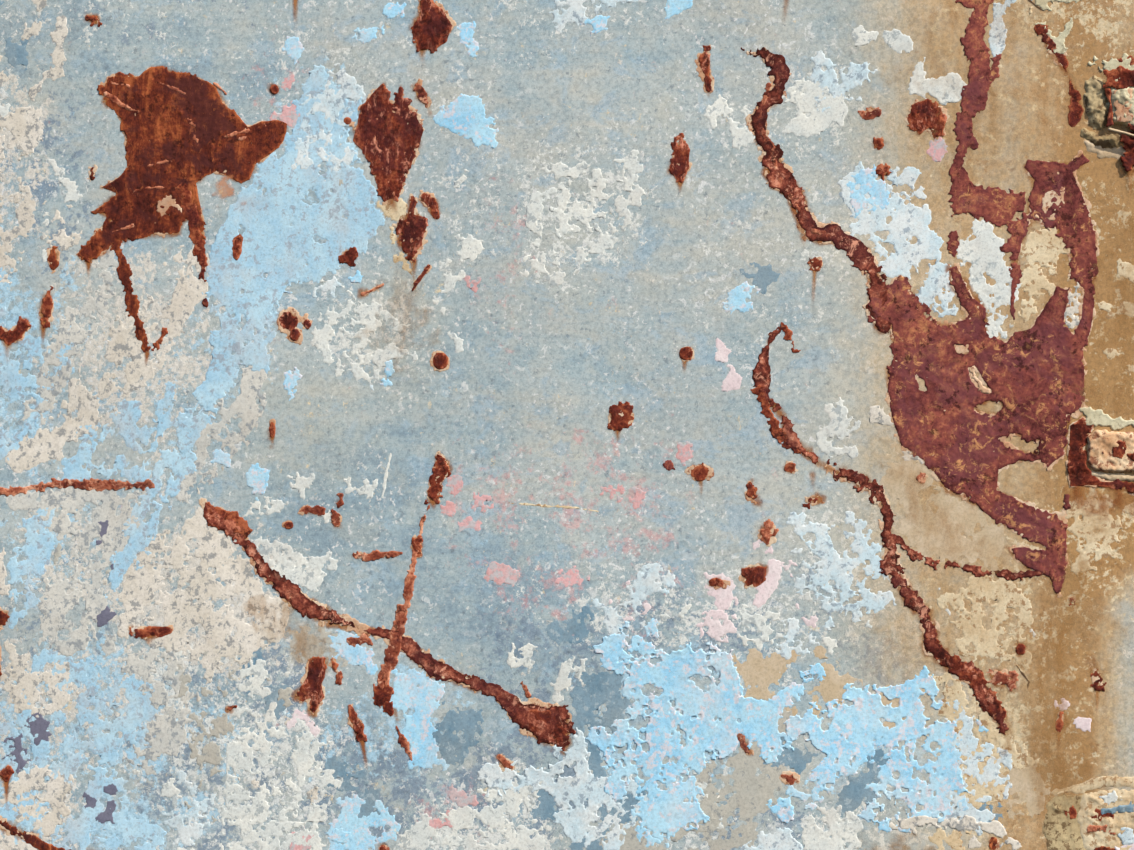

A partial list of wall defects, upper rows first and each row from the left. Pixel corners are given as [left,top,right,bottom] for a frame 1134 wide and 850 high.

peeling [0,0,83,284]
corrosion [76,66,287,361]
corrosion [344,78,440,270]
corrosion [411,0,457,55]
peeling [851,25,967,106]
peeling [837,161,1081,339]
corrosion [862,0,1134,606]
corrosion [0,478,155,497]
peeling [0,64,385,850]
peeling [753,511,897,631]
corrosion [292,656,343,717]
peeling [324,563,1051,850]